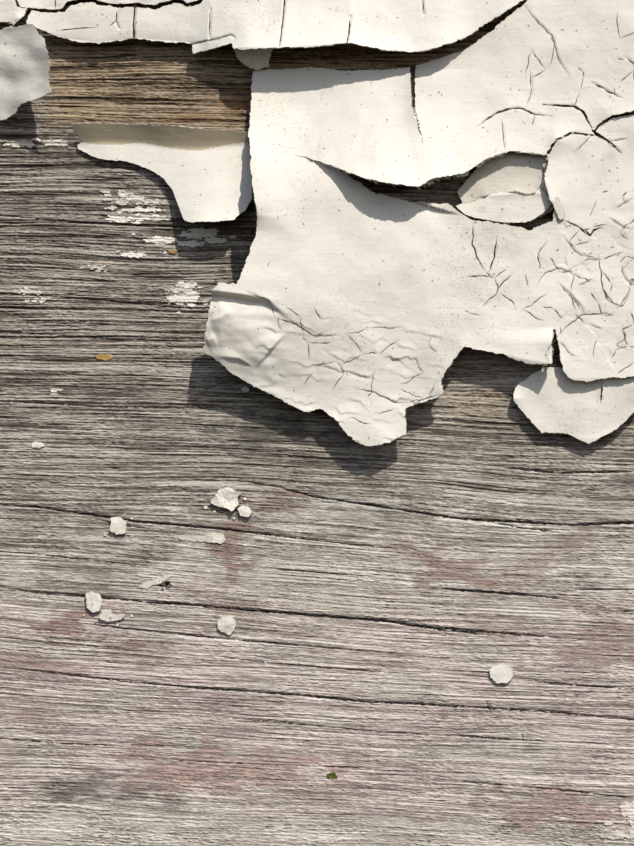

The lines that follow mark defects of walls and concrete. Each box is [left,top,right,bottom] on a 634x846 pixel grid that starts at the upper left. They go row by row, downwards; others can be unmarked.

peeling [0,0,634,447]
crack [294,154,359,179]
crack [411,65,423,142]
crack [465,191,634,373]
crack [481,7,634,154]
crack [248,292,439,424]
crack [251,482,634,532]
crack [4,587,584,641]